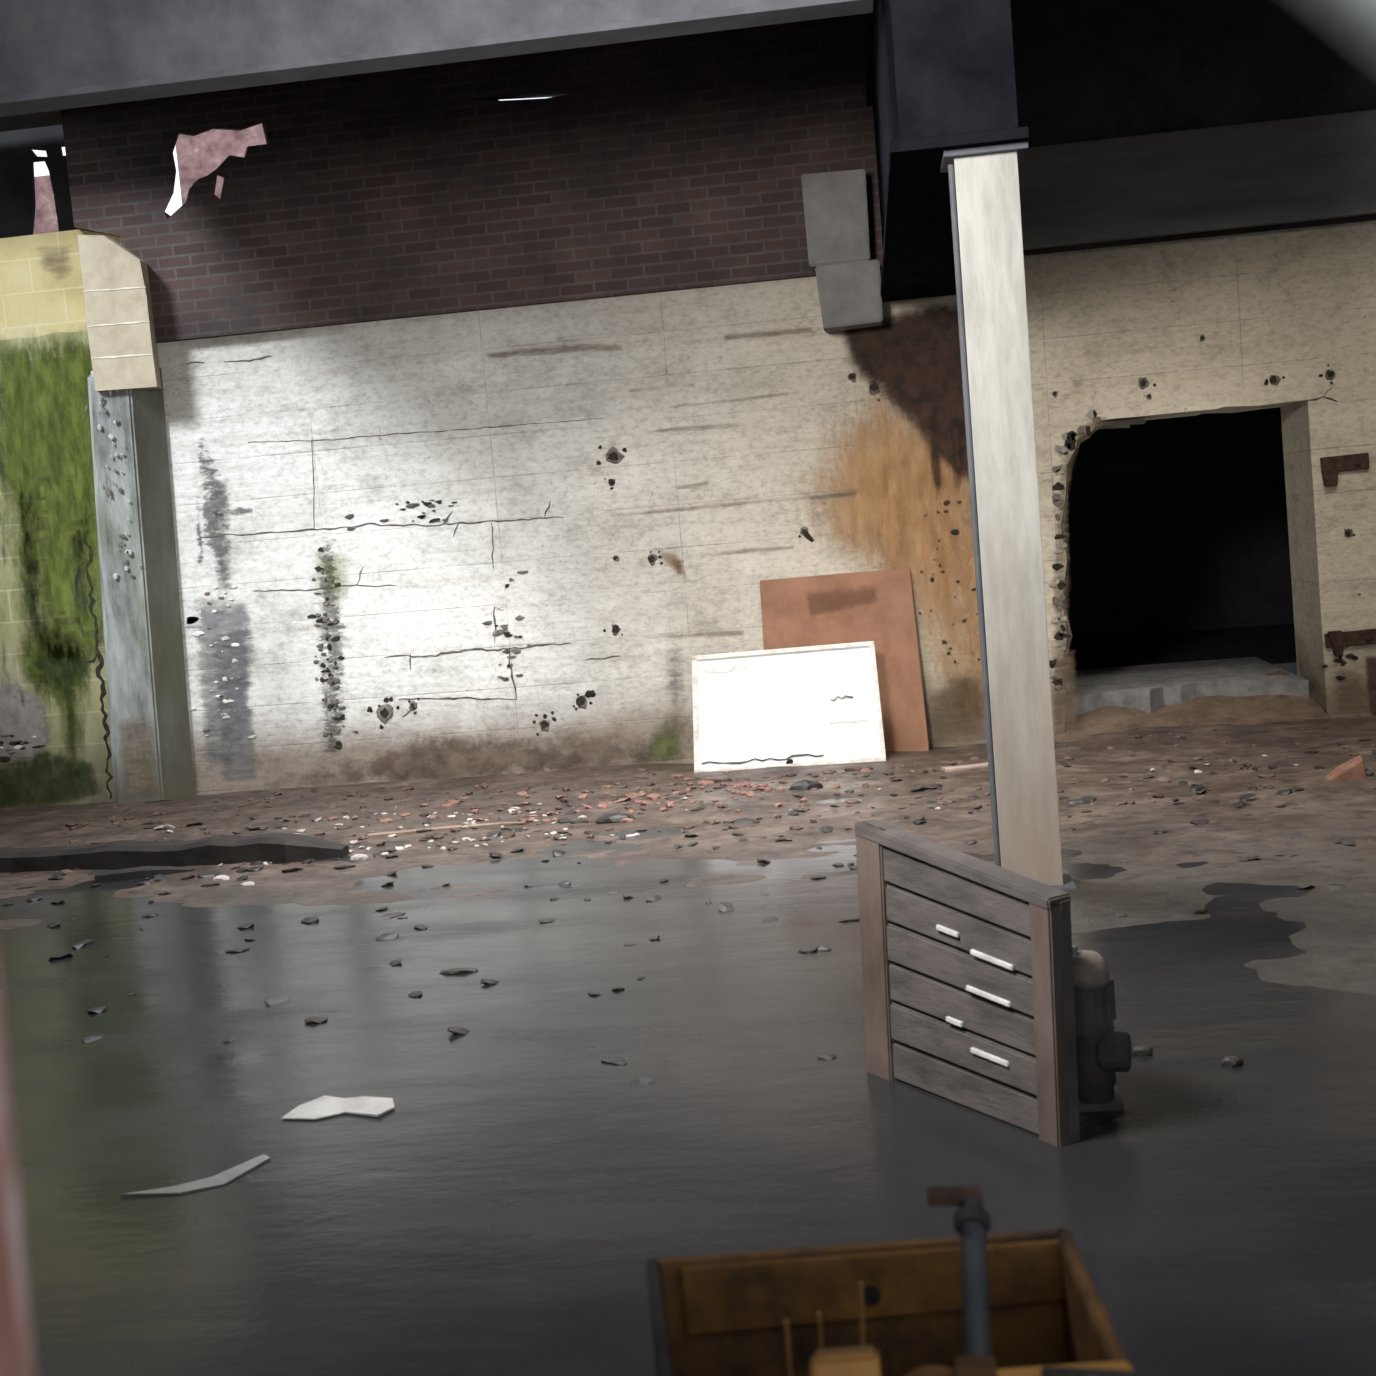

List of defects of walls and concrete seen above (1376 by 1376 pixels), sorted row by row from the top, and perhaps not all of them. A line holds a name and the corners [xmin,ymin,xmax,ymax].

damp [55,347,107,630]
damp [197,445,252,588]
damp [201,605,254,779]
mould [318,539,345,752]
rust [828,405,984,714]
spalling [1049,409,1101,735]